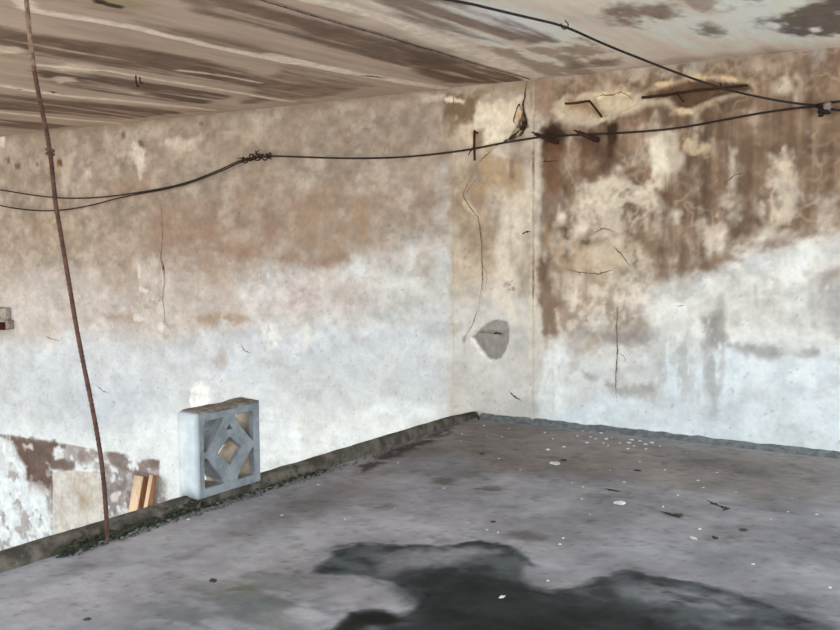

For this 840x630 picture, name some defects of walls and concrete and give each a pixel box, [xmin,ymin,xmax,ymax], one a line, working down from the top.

crack [159,198,168,349]
crack [261,0,560,335]
leakage [0,0,840,425]
flaking render [455,92,530,149]
crack [615,300,627,402]
peeling [0,431,170,551]